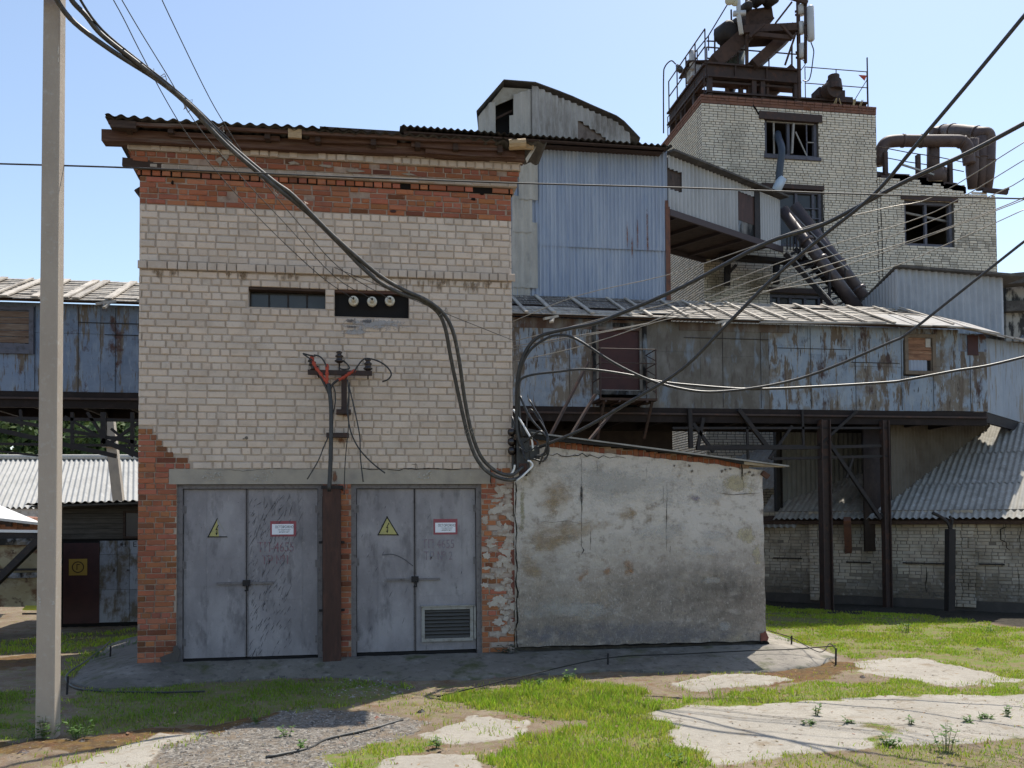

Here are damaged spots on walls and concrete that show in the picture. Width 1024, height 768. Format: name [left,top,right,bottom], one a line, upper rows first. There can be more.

peeling [481,485,515,638]
crack [362,453,758,648]